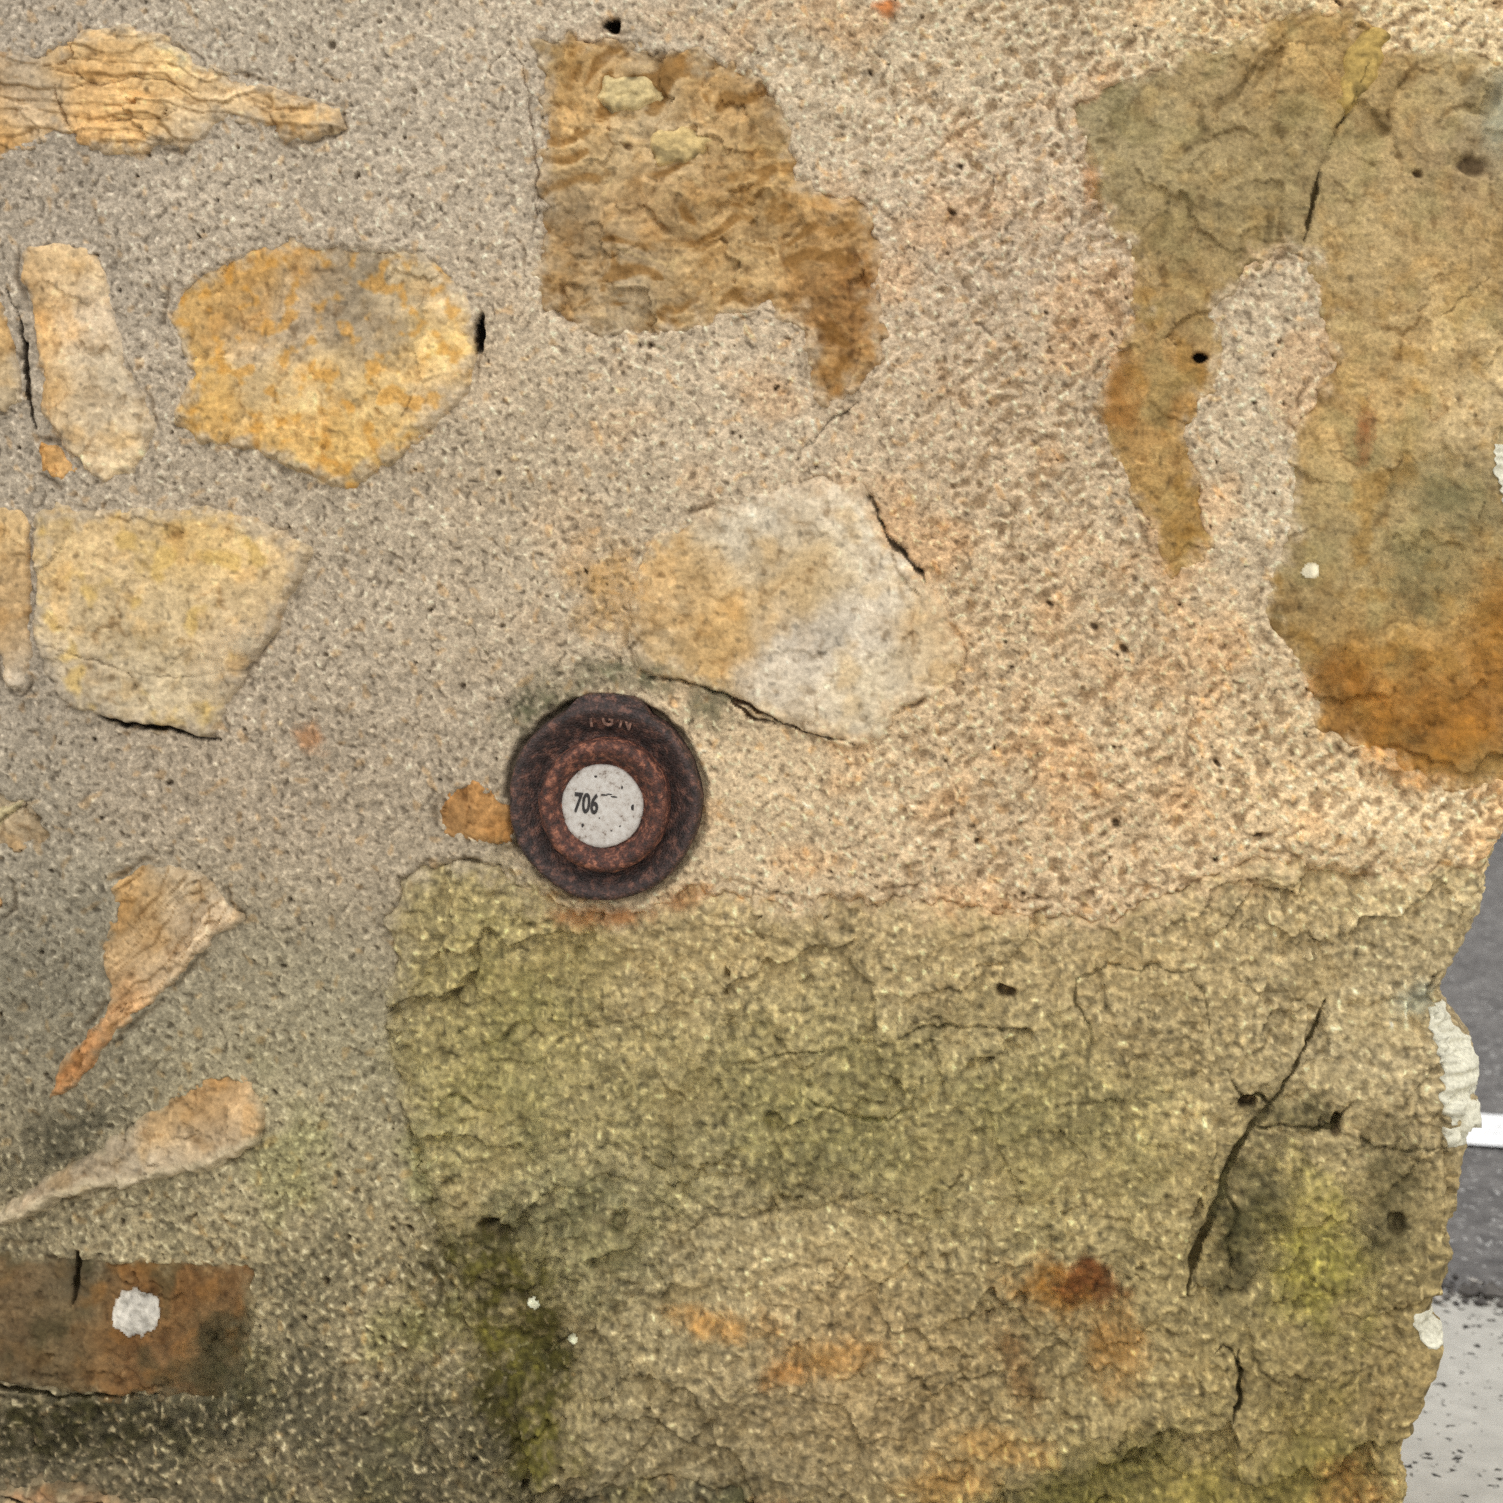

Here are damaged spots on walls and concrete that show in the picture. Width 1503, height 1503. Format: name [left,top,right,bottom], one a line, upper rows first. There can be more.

crack [8,293,37,427]
crack [872,498,924,575]
crack [1187,999,1349,1294]